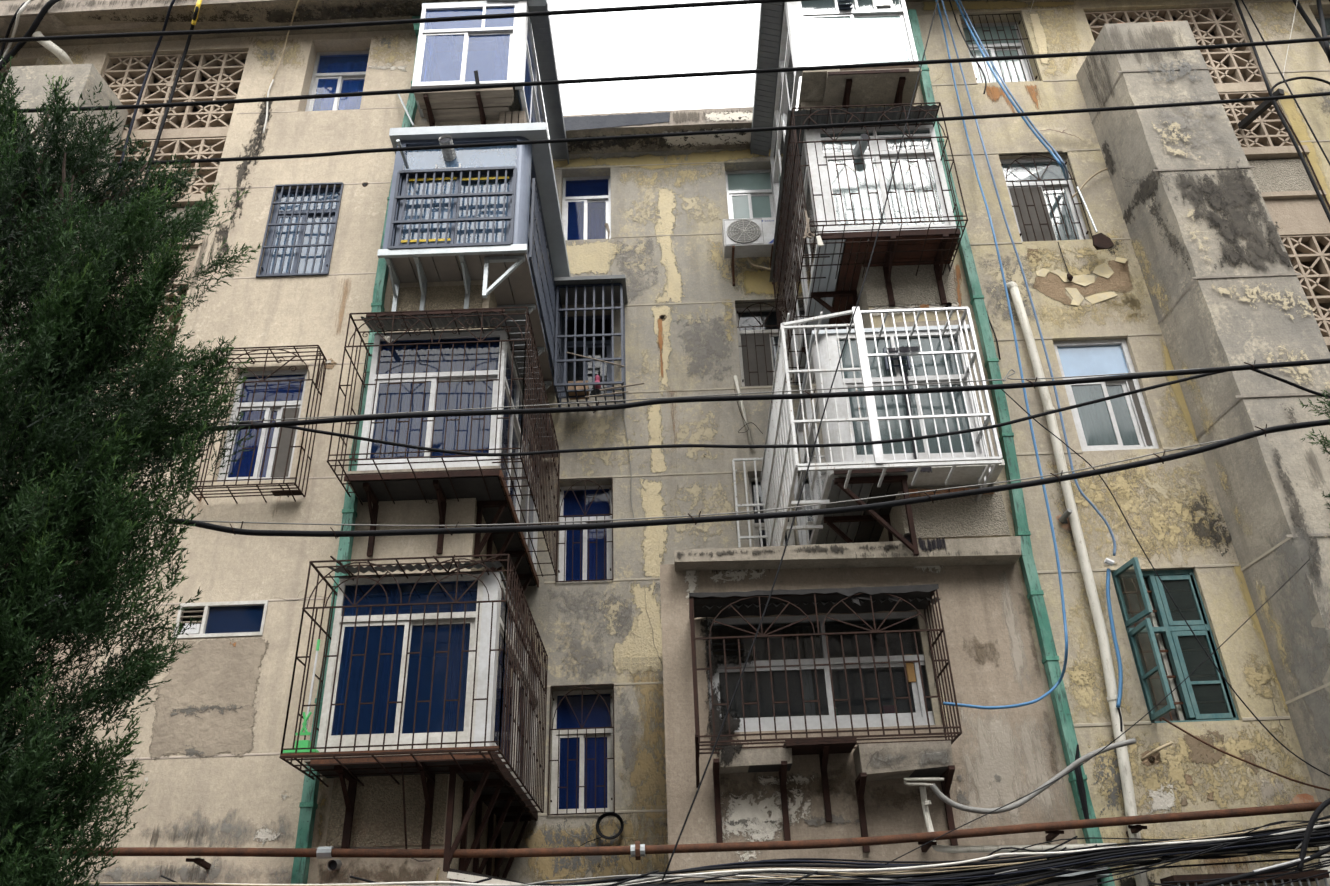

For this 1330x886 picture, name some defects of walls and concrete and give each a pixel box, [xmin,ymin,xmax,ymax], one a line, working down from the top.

leakage [1083,25,1203,106]
leakage [1102,97,1292,270]
spalling [988,231,1170,327]
peeling [525,149,781,884]
peeling [1048,460,1240,721]
mould [1184,495,1232,556]
peeling [1234,565,1290,708]
peeling [1088,722,1314,833]